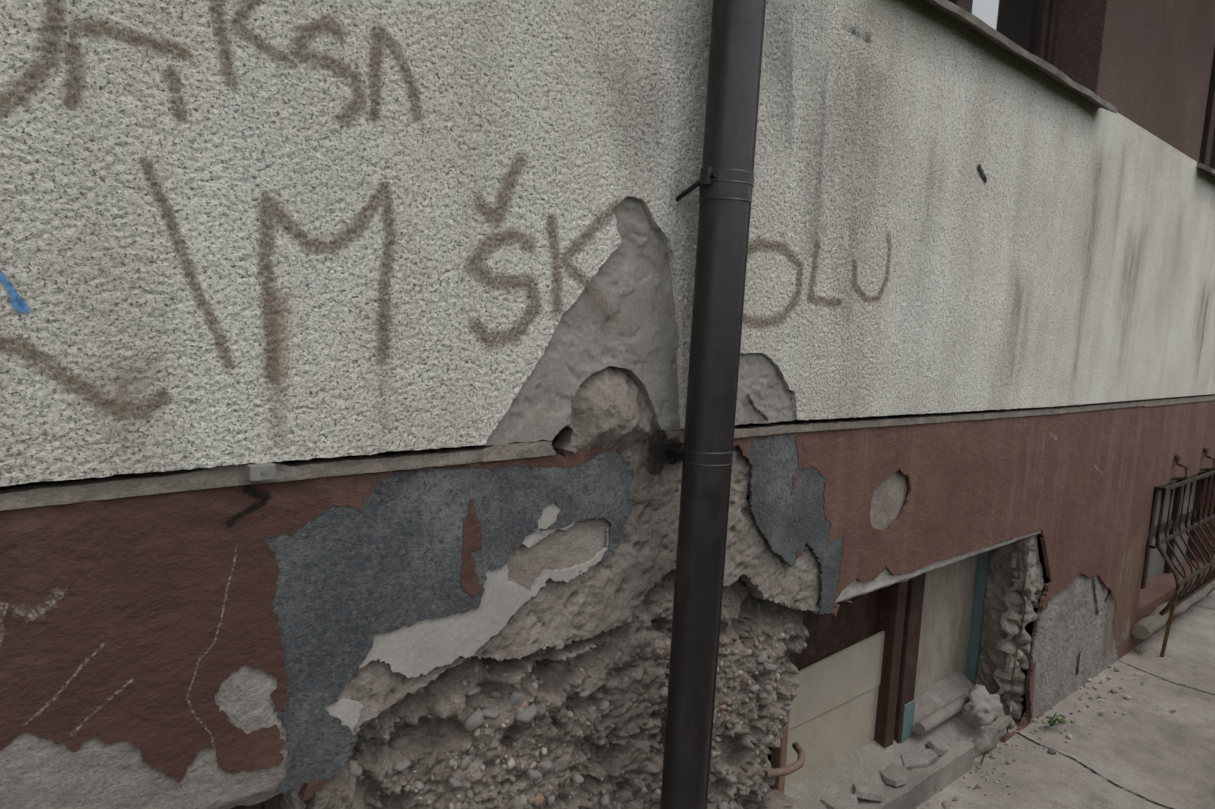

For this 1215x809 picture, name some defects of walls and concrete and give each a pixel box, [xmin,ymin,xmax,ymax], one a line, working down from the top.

spalling [0,440,683,809]
spalling [707,433,1139,809]